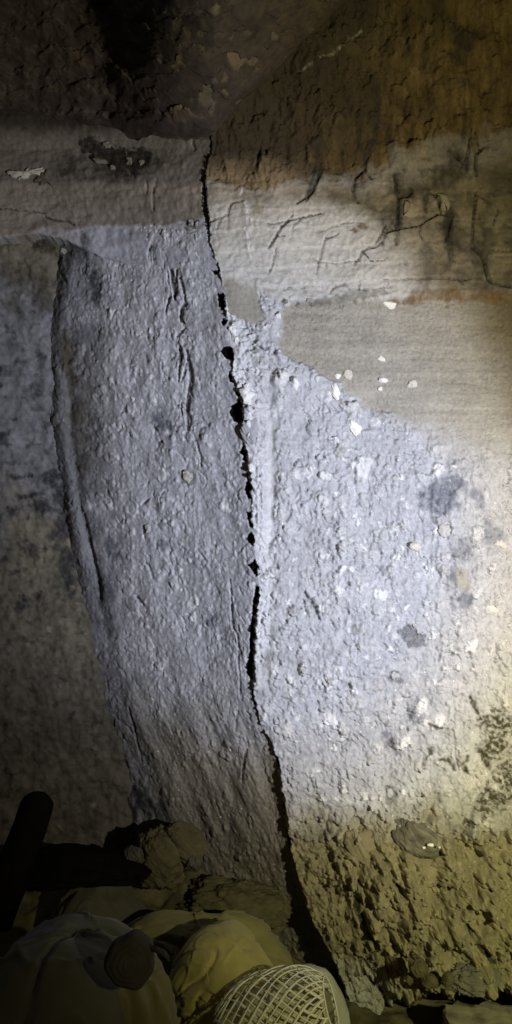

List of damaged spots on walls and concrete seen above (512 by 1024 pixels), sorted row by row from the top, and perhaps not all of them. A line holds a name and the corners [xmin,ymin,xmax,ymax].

crack [193,139,211,242]
crack [267,174,322,272]
crack [352,128,511,288]
spalling [225,307,239,343]
spalling [239,383,255,405]
crack [212,270,290,850]
spalling [398,623,426,648]